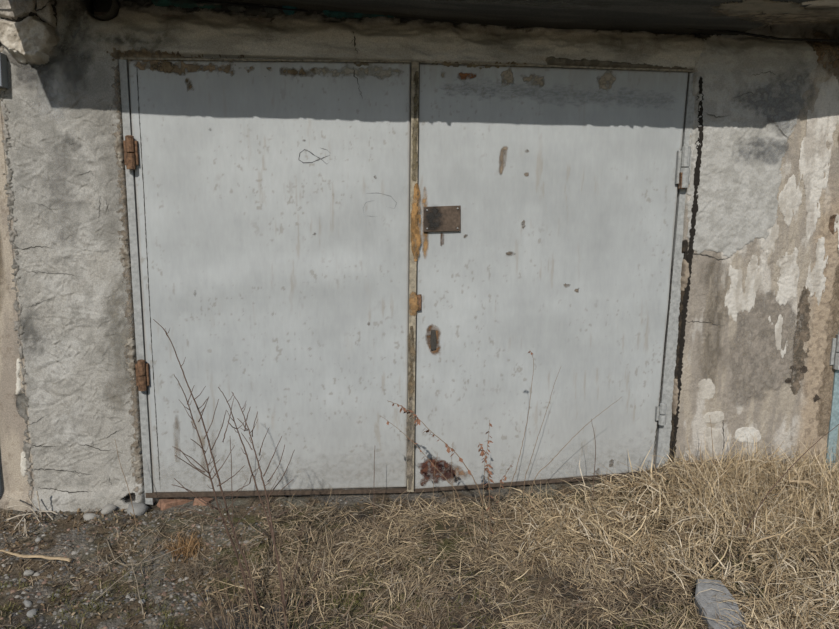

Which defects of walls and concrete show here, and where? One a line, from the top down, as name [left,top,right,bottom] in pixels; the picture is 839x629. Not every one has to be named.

flaking render [712,0,839,15]
spalling [0,43,63,82]
spalling [432,61,544,86]
corrosion [411,71,428,262]
corrosion [499,147,507,174]
spalling [106,47,227,495]
crack [669,77,727,464]
peeling [724,73,839,436]
corrosion [409,292,419,316]
corrosion [406,325,466,490]
crack [34,468,112,493]